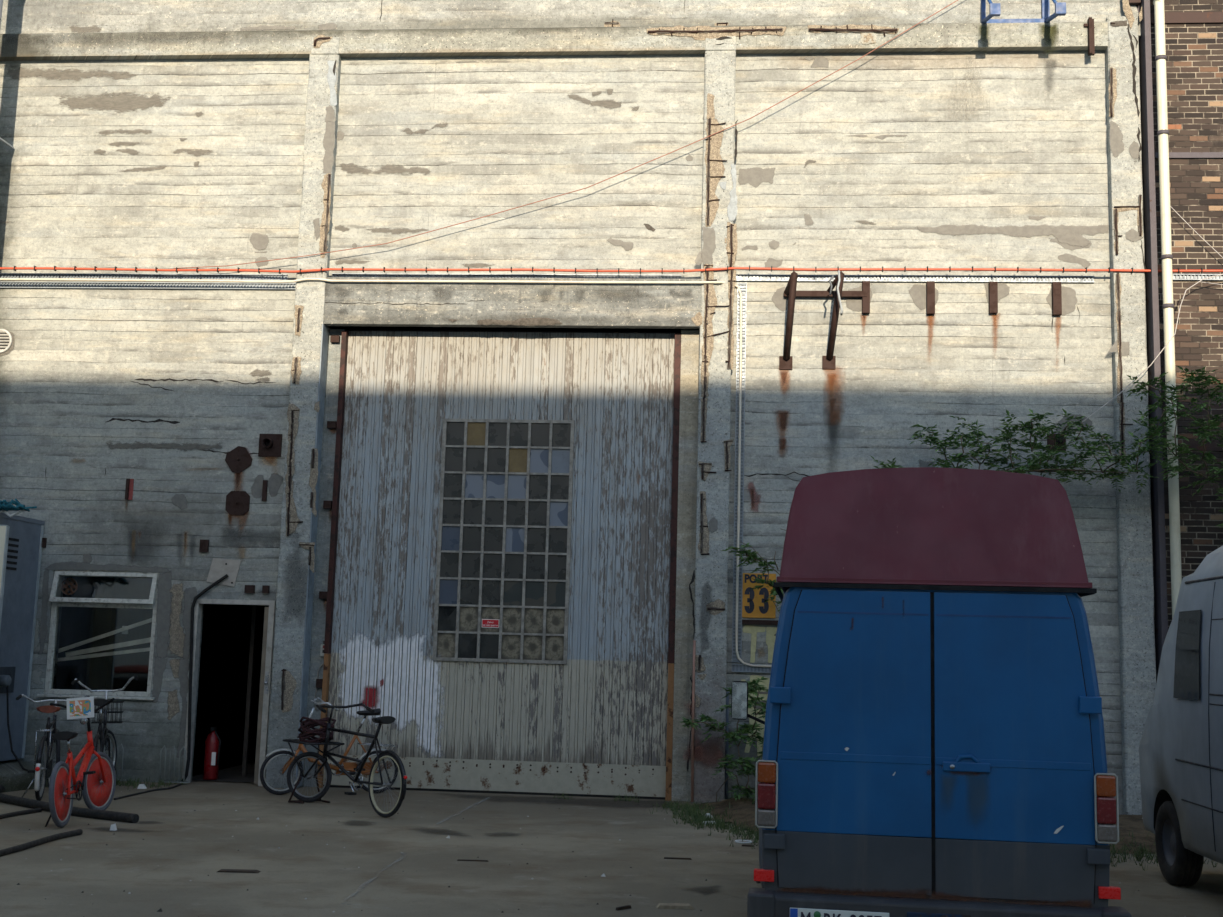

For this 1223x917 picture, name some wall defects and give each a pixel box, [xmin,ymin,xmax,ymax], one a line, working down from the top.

crack [131,378,274,391]
crack [106,417,180,425]